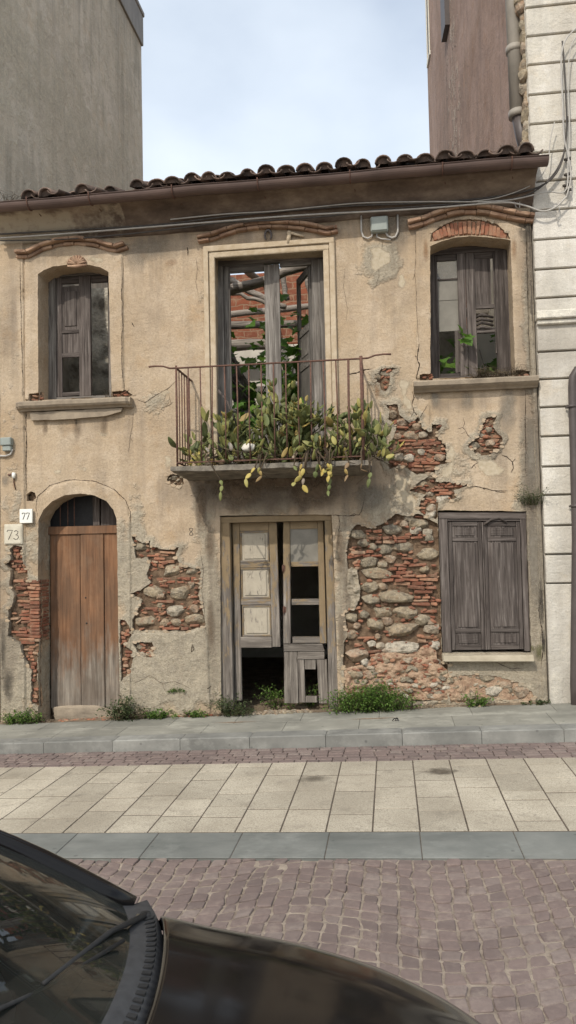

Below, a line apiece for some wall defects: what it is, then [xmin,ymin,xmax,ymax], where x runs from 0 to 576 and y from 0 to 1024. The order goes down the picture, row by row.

peeling [371,248,390,271]
crack [459,246,531,493]
spalling [3,544,50,708]
spalling [120,534,206,680]
spalling [341,366,538,705]